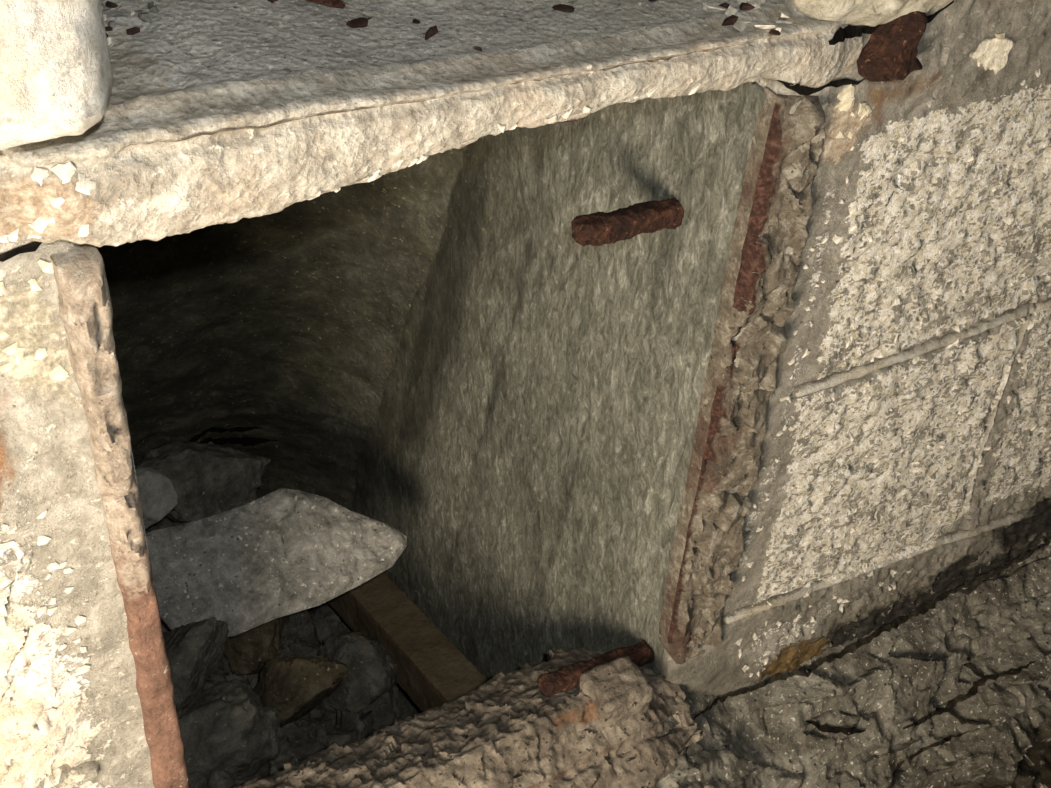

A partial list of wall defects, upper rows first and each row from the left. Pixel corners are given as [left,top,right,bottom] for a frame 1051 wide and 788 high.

corrosion [668,103,782,644]
crack [693,541,1051,720]
damp [758,498,1051,681]
crack [806,720,866,735]
crack [887,657,1036,788]